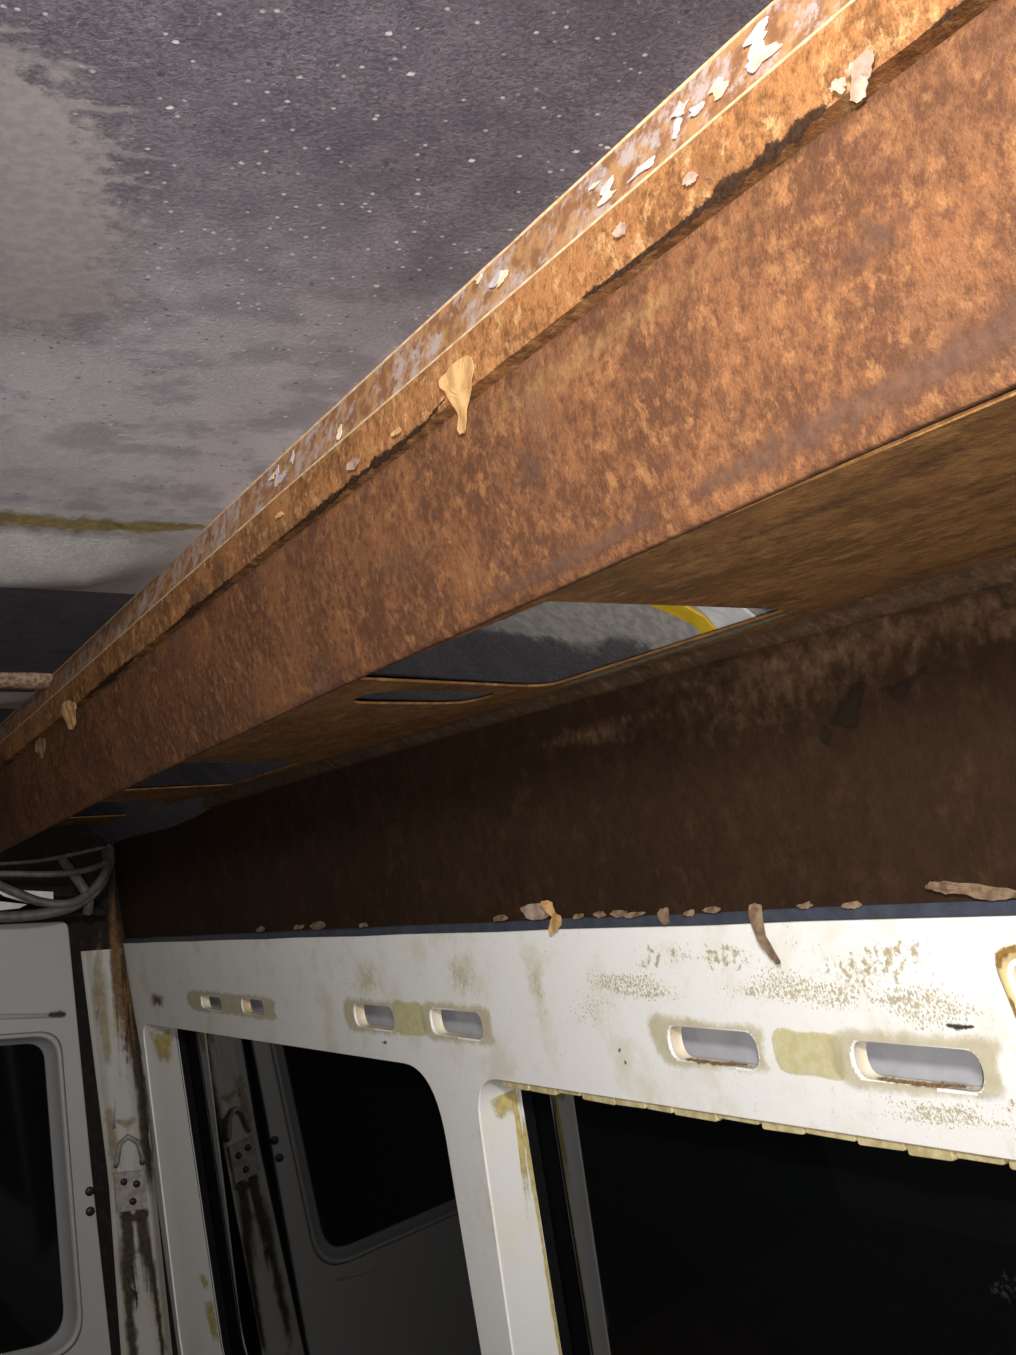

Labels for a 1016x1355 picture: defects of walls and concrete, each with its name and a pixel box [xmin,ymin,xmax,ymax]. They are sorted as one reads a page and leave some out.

peeling [743,16,782,74]
peeling [828,49,875,103]
peeling [670,77,729,139]
water stain [0,44,160,333]
crack [581,102,830,299]
peeling [439,356,474,434]
crack [280,398,446,540]
rust [732,617,920,722]
peeling [493,900,721,934]
peeling [748,903,781,965]
peeling [925,881,1016,901]
rust [996,945,1016,968]